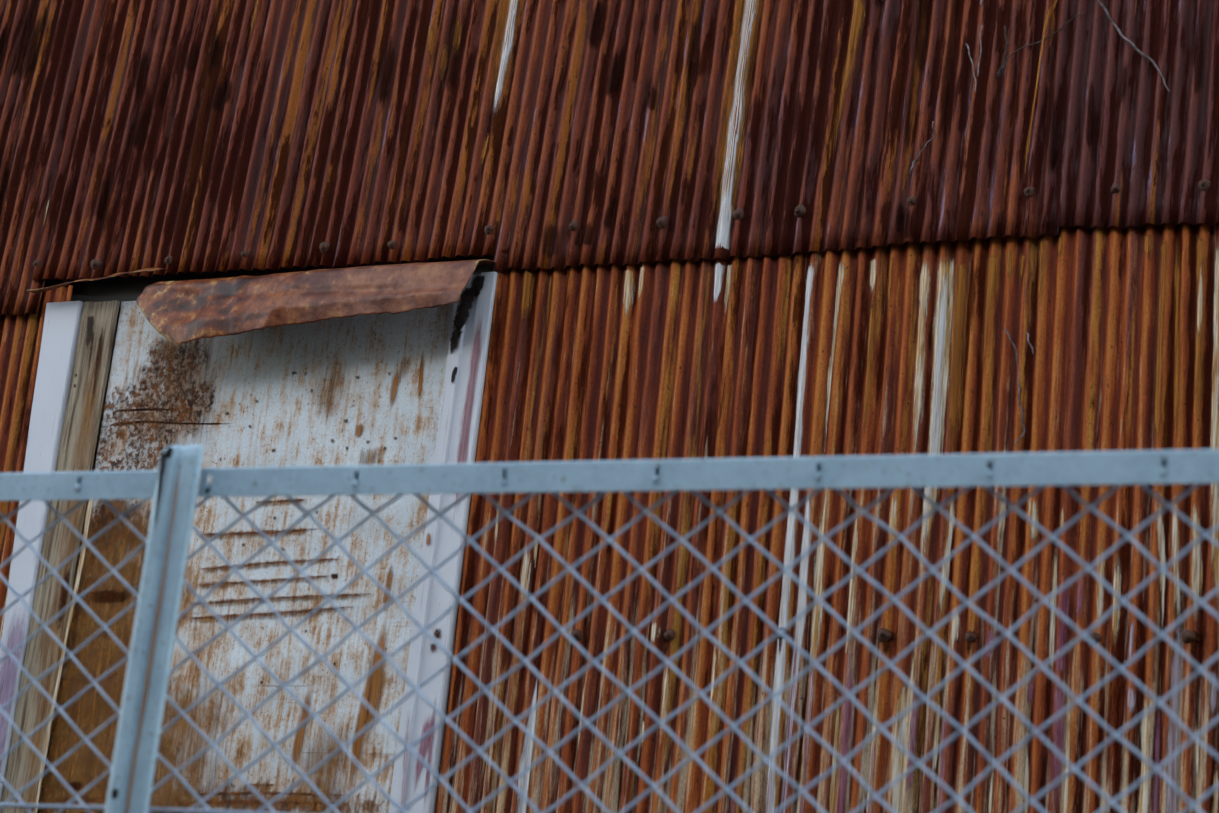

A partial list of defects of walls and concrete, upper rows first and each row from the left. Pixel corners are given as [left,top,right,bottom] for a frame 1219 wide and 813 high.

corrosion [837,0,864,133]
corrosion [1025,0,1058,162]
corrosion [320,373,342,413]
corrosion [390,354,423,404]
corrosion [983,250,1024,363]
corrosion [1145,234,1180,436]
corrosion [1194,238,1204,406]
corrosion [21,331,214,813]
corrosion [203,529,307,539]
corrosion [187,558,366,622]
corrosion [383,568,392,605]
corrosion [149,631,385,813]